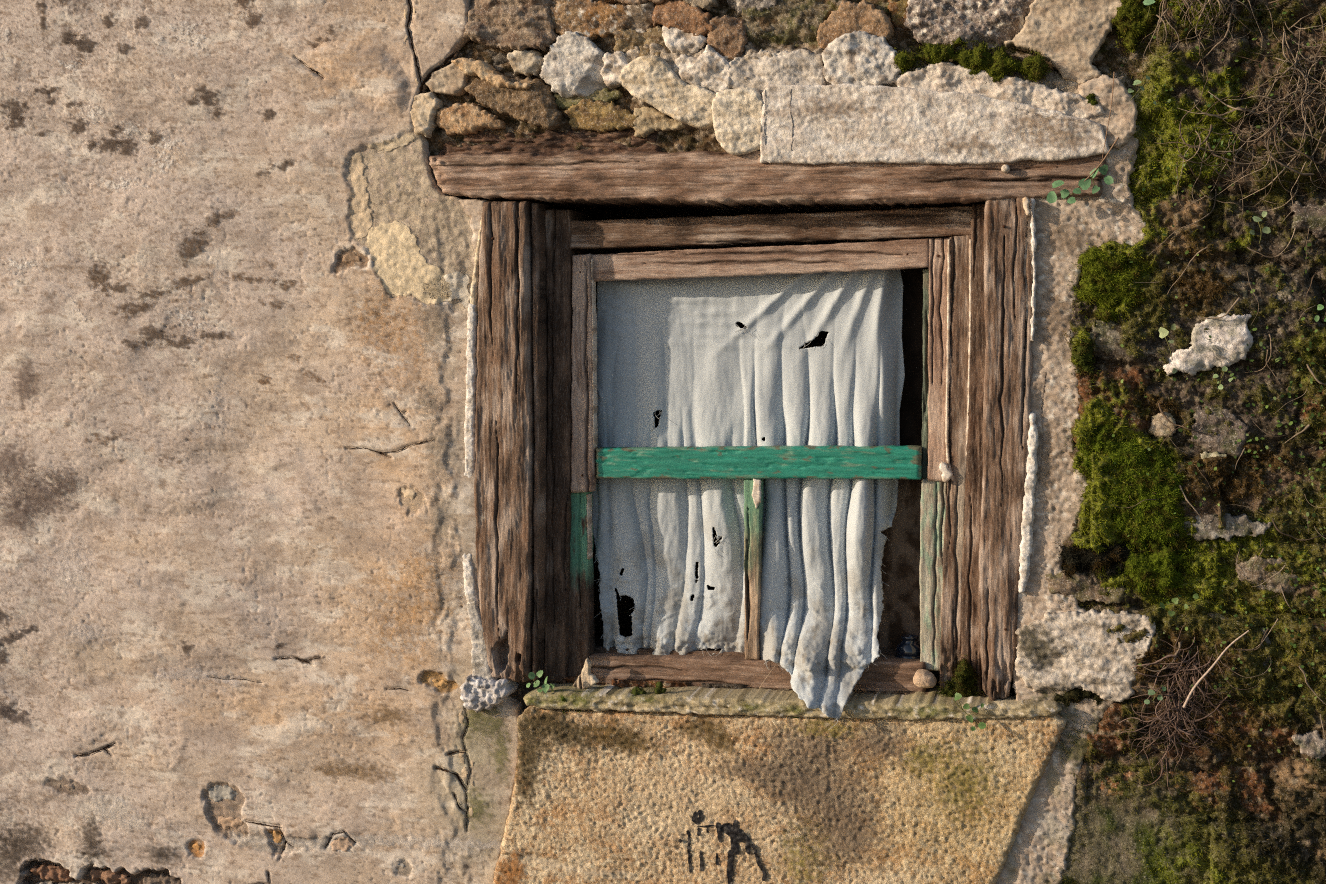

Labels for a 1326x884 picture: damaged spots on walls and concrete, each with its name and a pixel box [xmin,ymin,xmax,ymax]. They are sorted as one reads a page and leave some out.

crack [403,0,457,93]
spalling [334,132,474,311]
crack [347,404,435,458]
crack [435,711,475,832]
spalling [23,860,182,884]